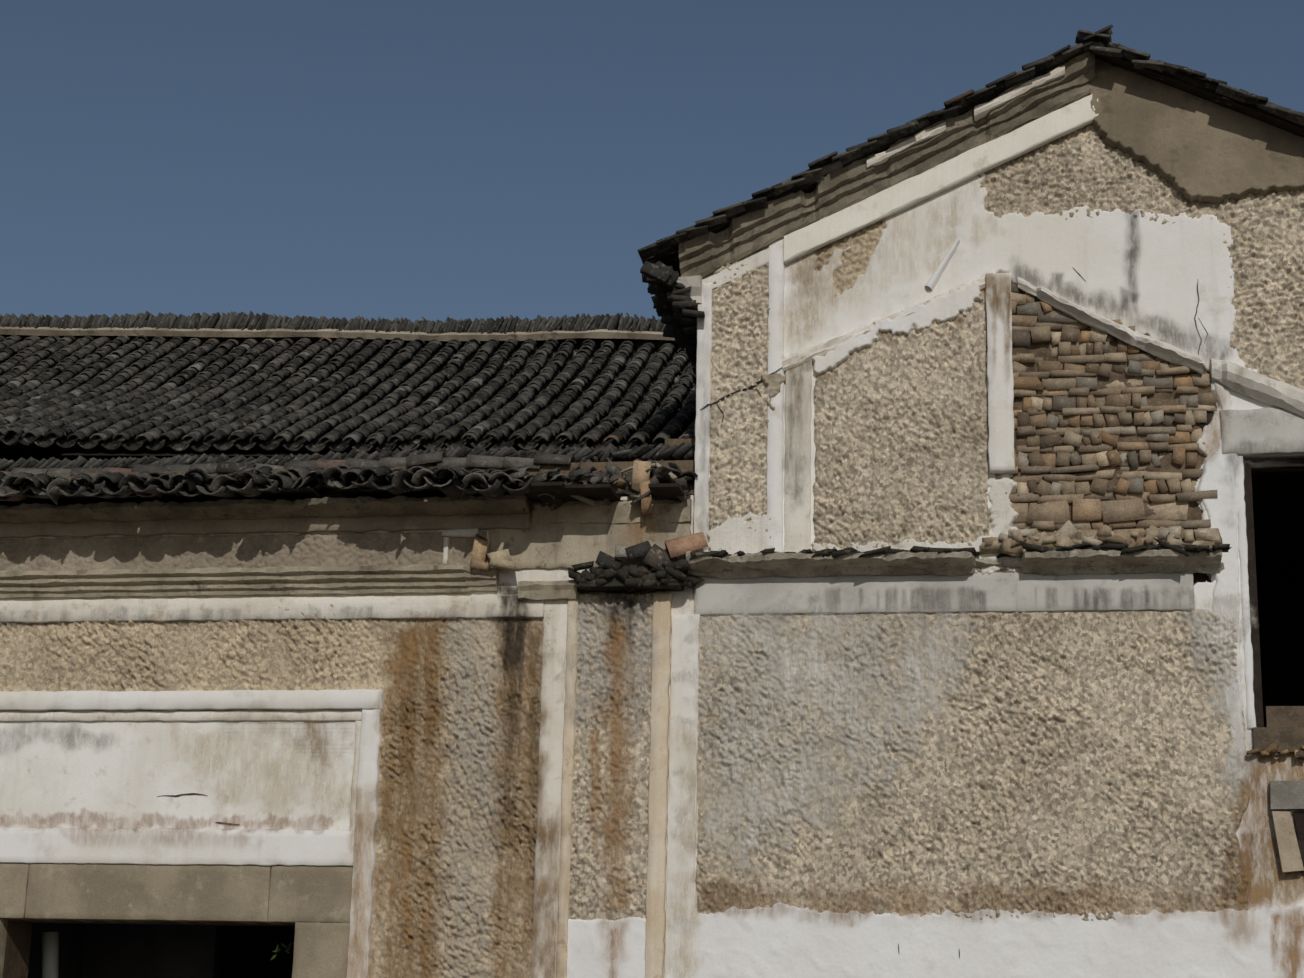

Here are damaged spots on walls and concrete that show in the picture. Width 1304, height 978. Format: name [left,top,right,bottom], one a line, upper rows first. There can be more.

flaking render [812,220,887,297]
flaking render [977,58,1304,389]
peeling [595,511,775,574]
flaking render [811,280,1223,574]
leakage [379,621,443,978]
leakage [493,584,557,978]